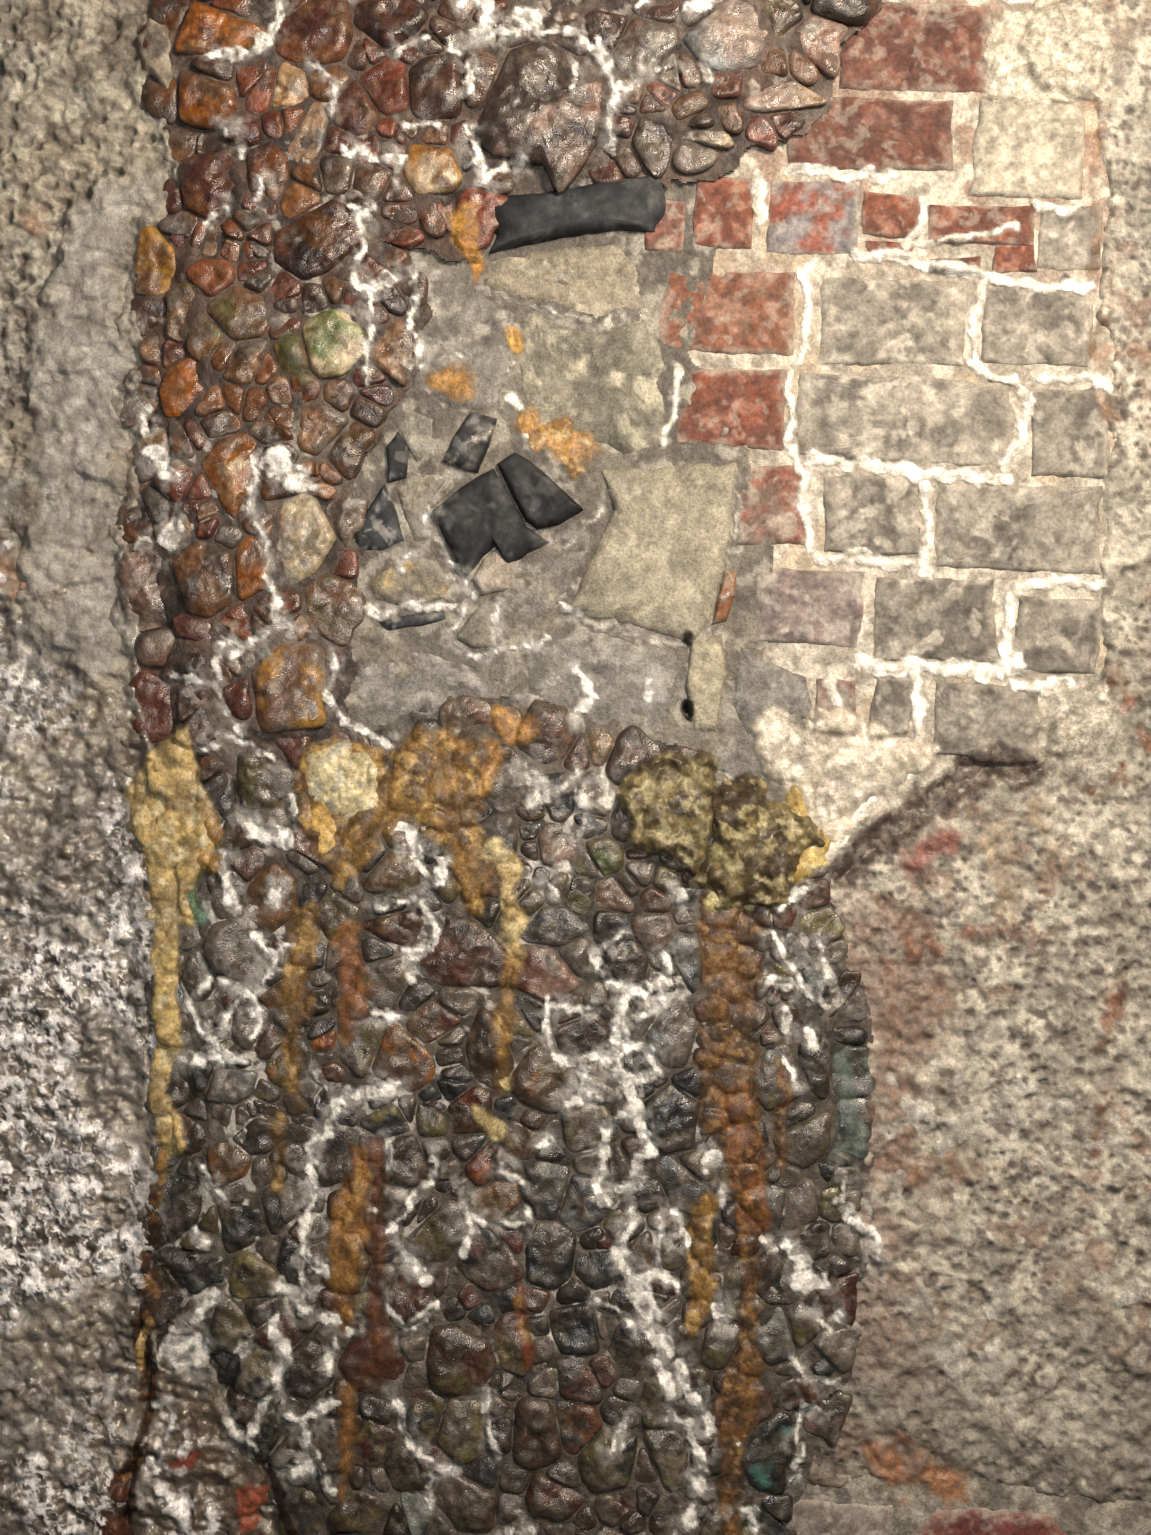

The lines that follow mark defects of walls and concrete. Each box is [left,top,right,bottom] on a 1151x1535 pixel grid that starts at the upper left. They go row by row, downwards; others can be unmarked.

leakage [457,0,660,146]
spalling [116,0,1122,820]
leakage [783,195,1113,580]
crack [98,1184,163,1535]
leakage [0,560,614,1377]
rust [271,903,368,1191]
rust [327,1138,395,1501]
spalling [137,693,744,1535]
rust [472,1105,507,1140]
leakage [542,931,715,1535]
rust [685,888,793,1535]
spalling [733,583,1151,1535]